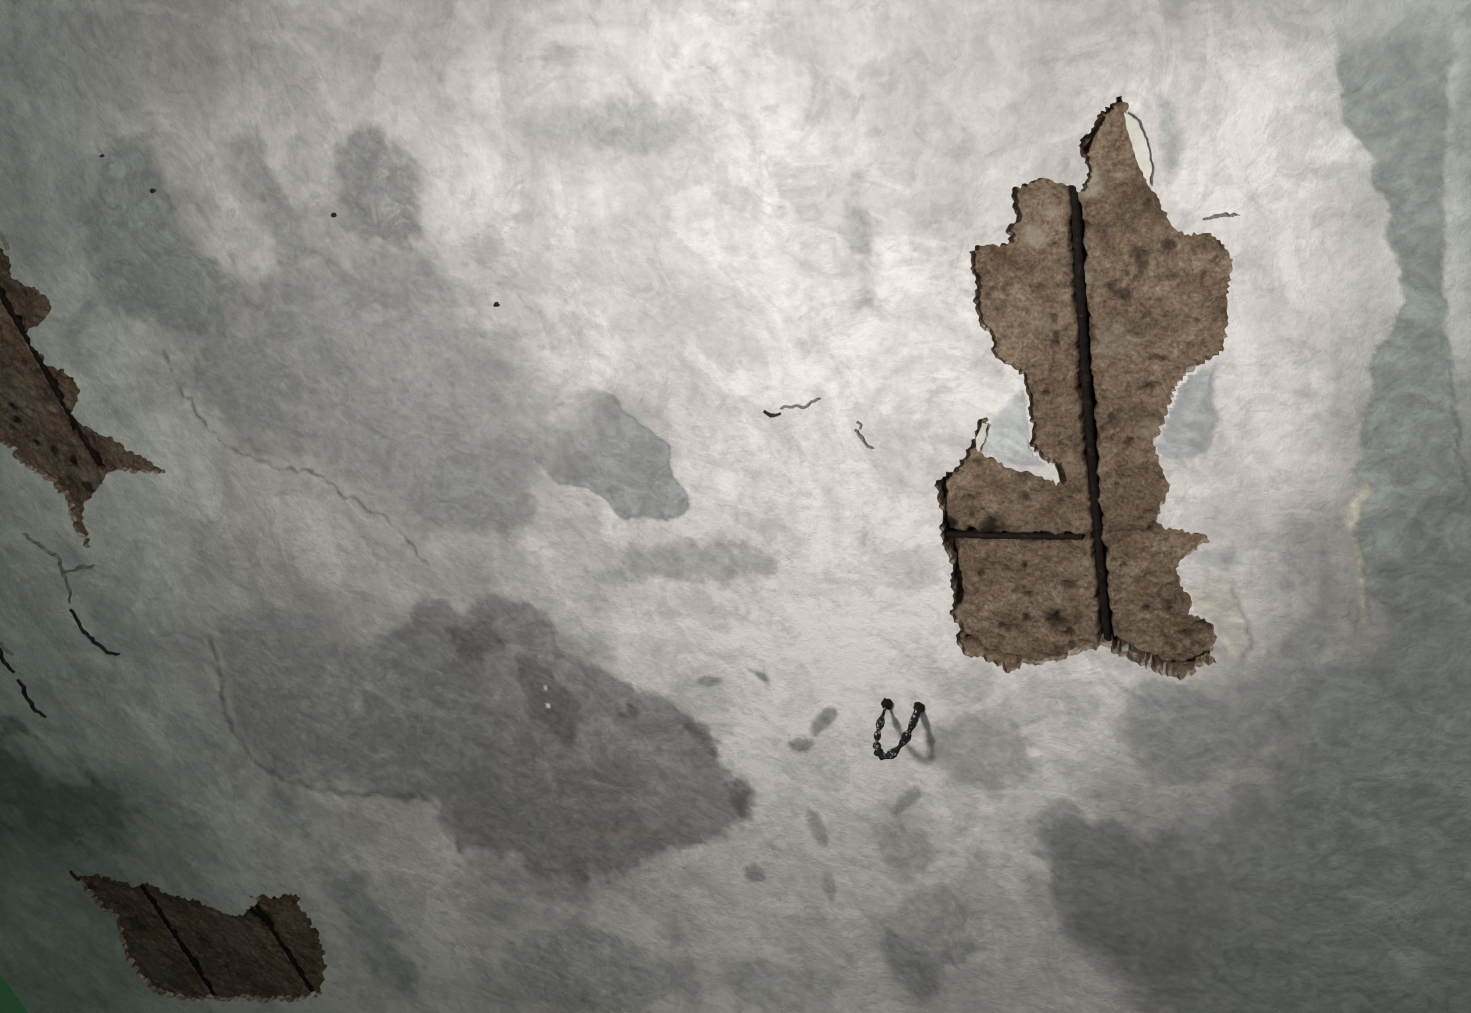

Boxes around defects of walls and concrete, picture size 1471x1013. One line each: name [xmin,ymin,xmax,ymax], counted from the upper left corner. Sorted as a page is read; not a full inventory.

water stain [337,130,419,240]
spalling [0,239,166,548]
water stain [86,144,529,533]
spalling [934,96,1233,680]
crack [23,532,121,656]
water stain [1129,50,1471,1013]
crack [0,641,47,718]
water stain [218,596,750,901]
water stain [746,866,763,881]
water stain [1046,816,1148,925]
spalling [78,874,328,1003]